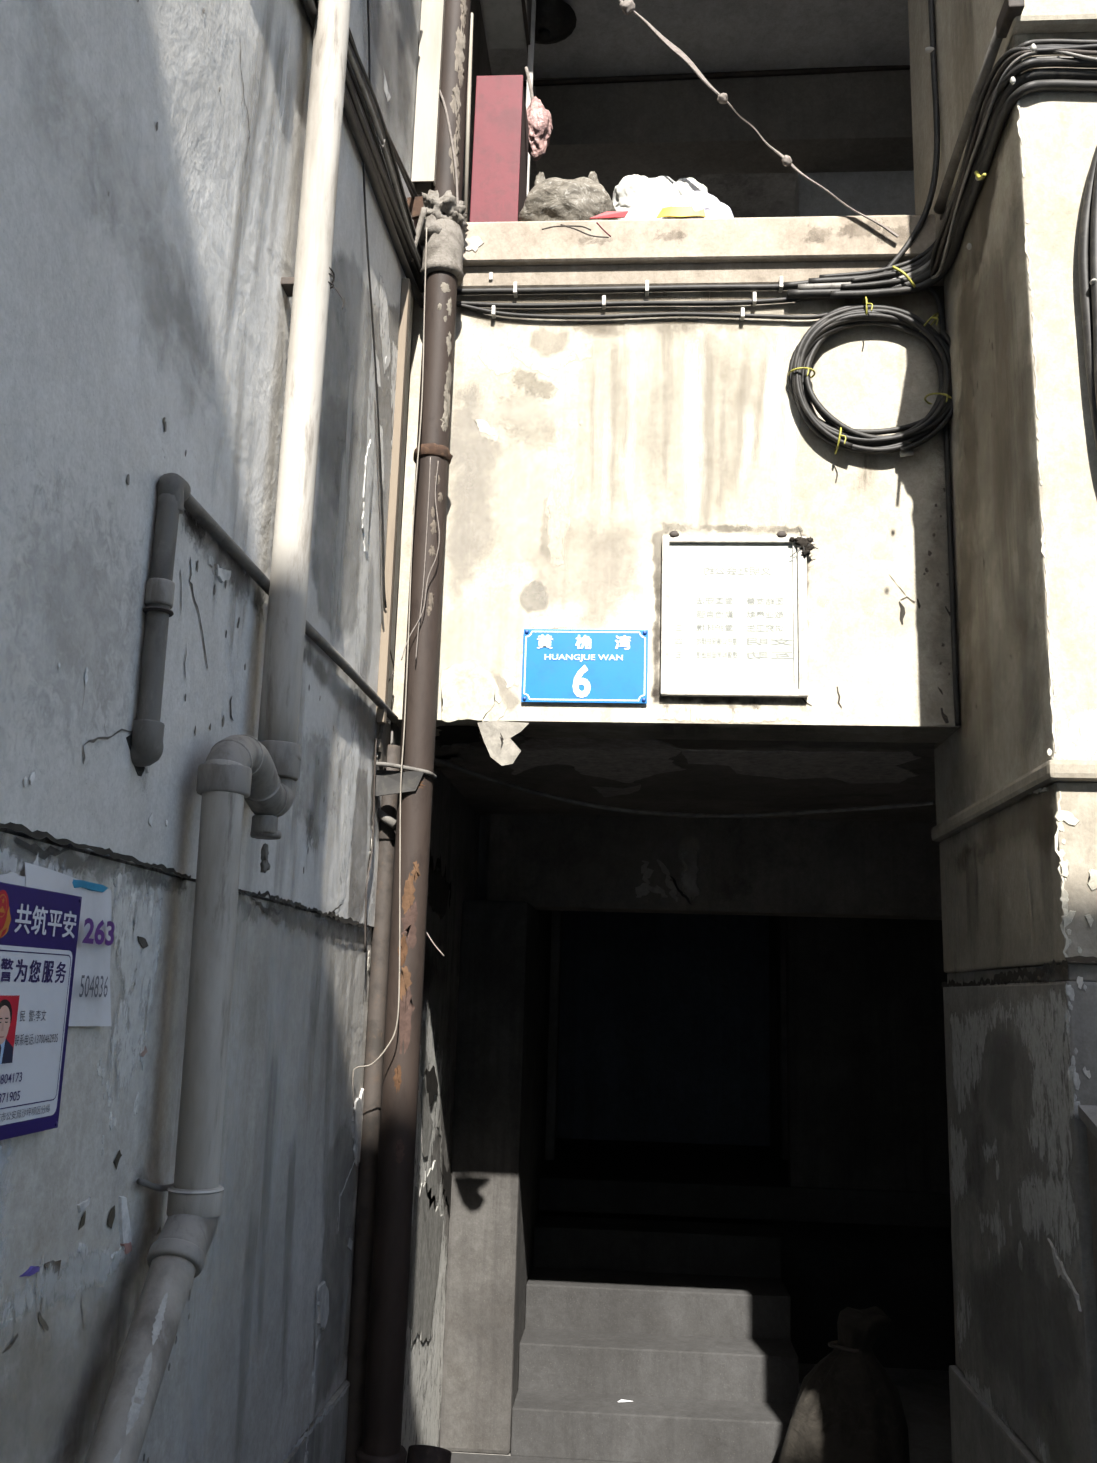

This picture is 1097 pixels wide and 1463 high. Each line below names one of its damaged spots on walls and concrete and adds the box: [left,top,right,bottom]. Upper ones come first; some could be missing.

damp [313,264,373,636]
damp [744,343,800,506]
crack [180,557,208,678]
flaking render [434,659,921,797]
damp [323,770,368,920]
flaking render [428,850,451,919]
flaking render [1030,787,1097,957]
rust [393,861,420,1093]
flaking render [0,1196,132,1353]
damp [324,1153,357,1395]
flaking render [401,1001,456,1462]